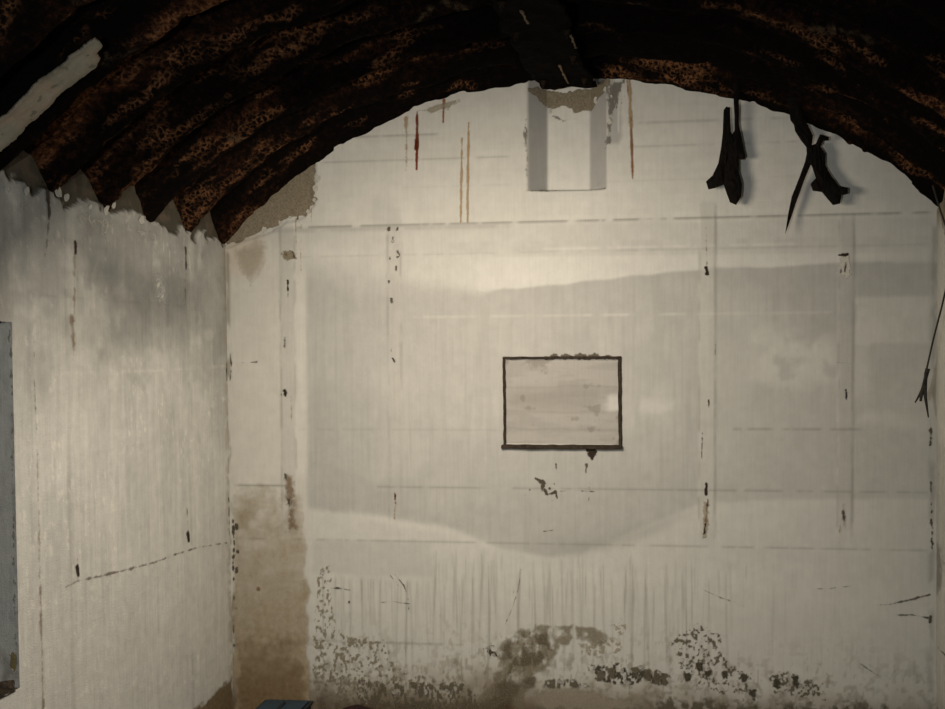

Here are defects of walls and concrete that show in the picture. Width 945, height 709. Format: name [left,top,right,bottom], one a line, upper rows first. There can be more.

spalling [0,37,103,152]
spalling [226,164,321,273]
rust [405,114,419,170]
rust [460,123,469,223]
spalling [528,78,625,144]
crack [76,511,192,580]
crack [219,498,239,646]
water stain [196,555,324,709]
water stain [336,624,626,709]
water stain [658,698,726,709]